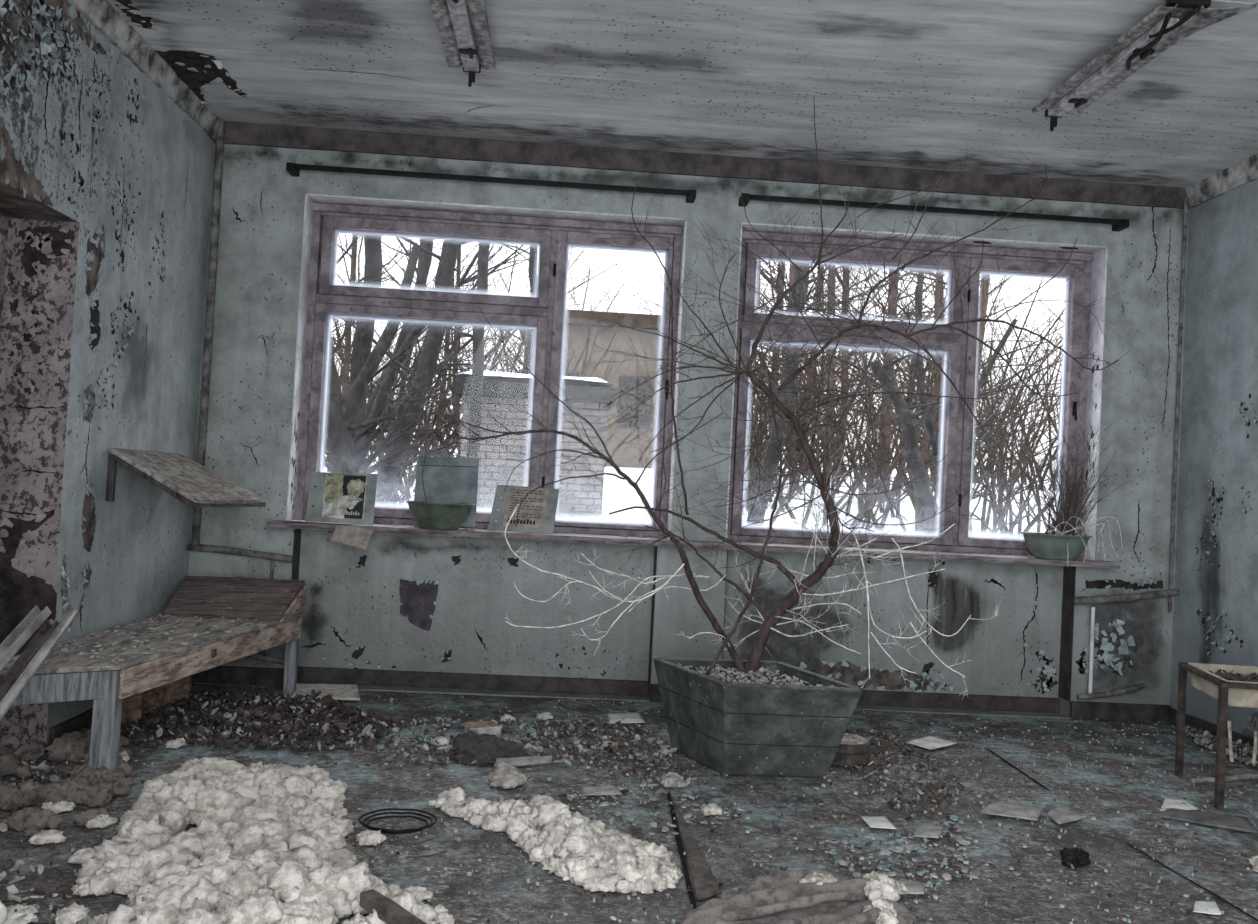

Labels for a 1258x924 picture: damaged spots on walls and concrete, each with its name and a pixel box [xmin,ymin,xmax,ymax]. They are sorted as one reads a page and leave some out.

peeling [112,0,154,29]
peeling [0,0,147,209]
peeling [155,50,247,106]
peeling [5,155,167,430]
peeling [0,482,97,657]
peeling [399,579,439,631]
damp [932,573,980,651]
peeling [1026,650,1059,694]
peeling [1076,619,1135,676]
crack [985,747,1053,793]
crack [1126,842,1258,922]